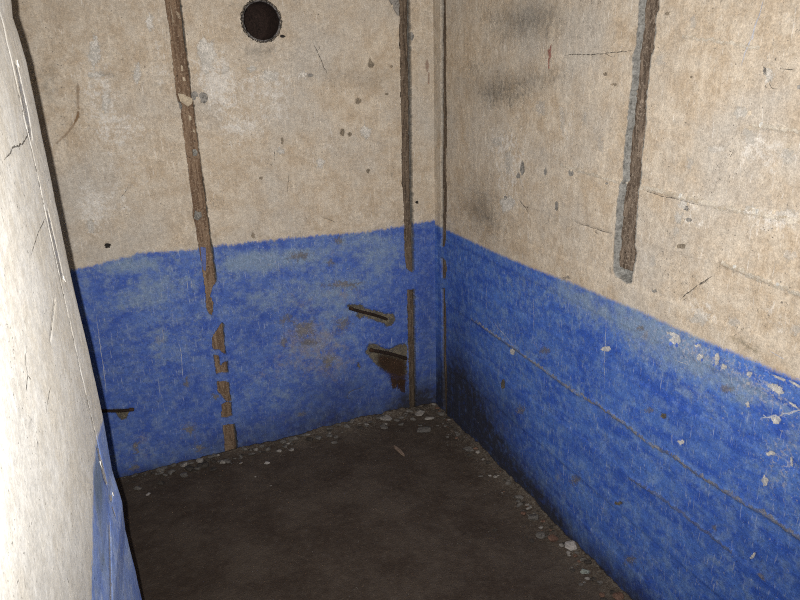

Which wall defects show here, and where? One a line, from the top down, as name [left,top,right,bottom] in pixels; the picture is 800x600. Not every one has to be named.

peeling [667,332,680,347]
corrosion [378,354,406,392]
peeling [768,375,800,395]